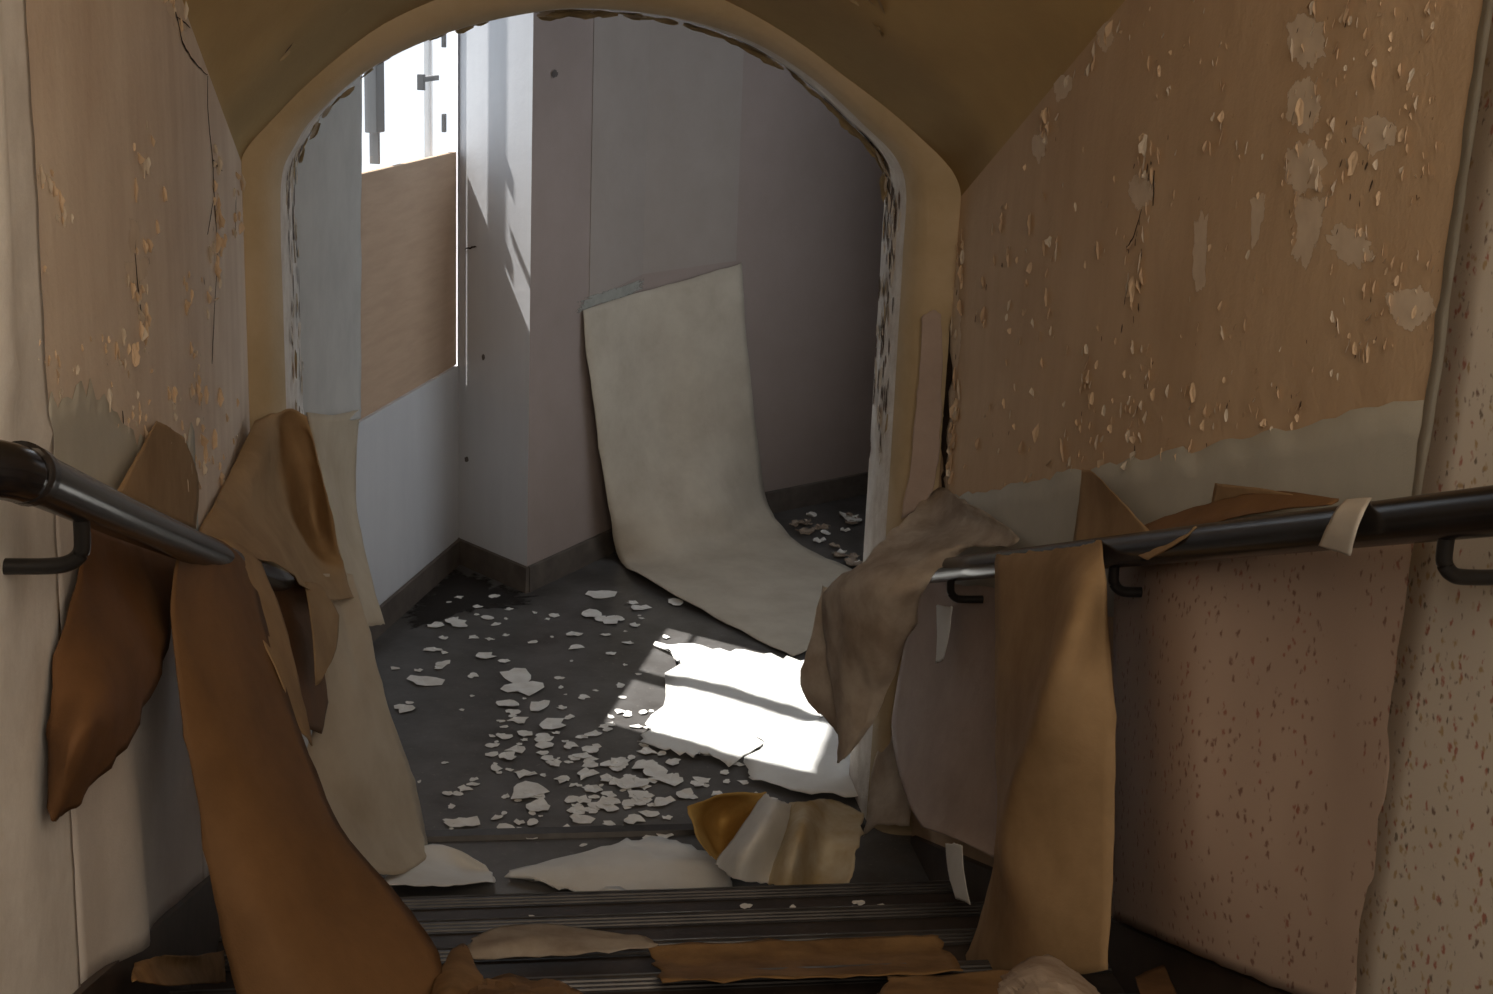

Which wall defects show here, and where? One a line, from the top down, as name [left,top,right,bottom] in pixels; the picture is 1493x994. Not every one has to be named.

peeling [38,121,240,492]
peeling [535,9,901,465]
peeling [945,0,1493,557]